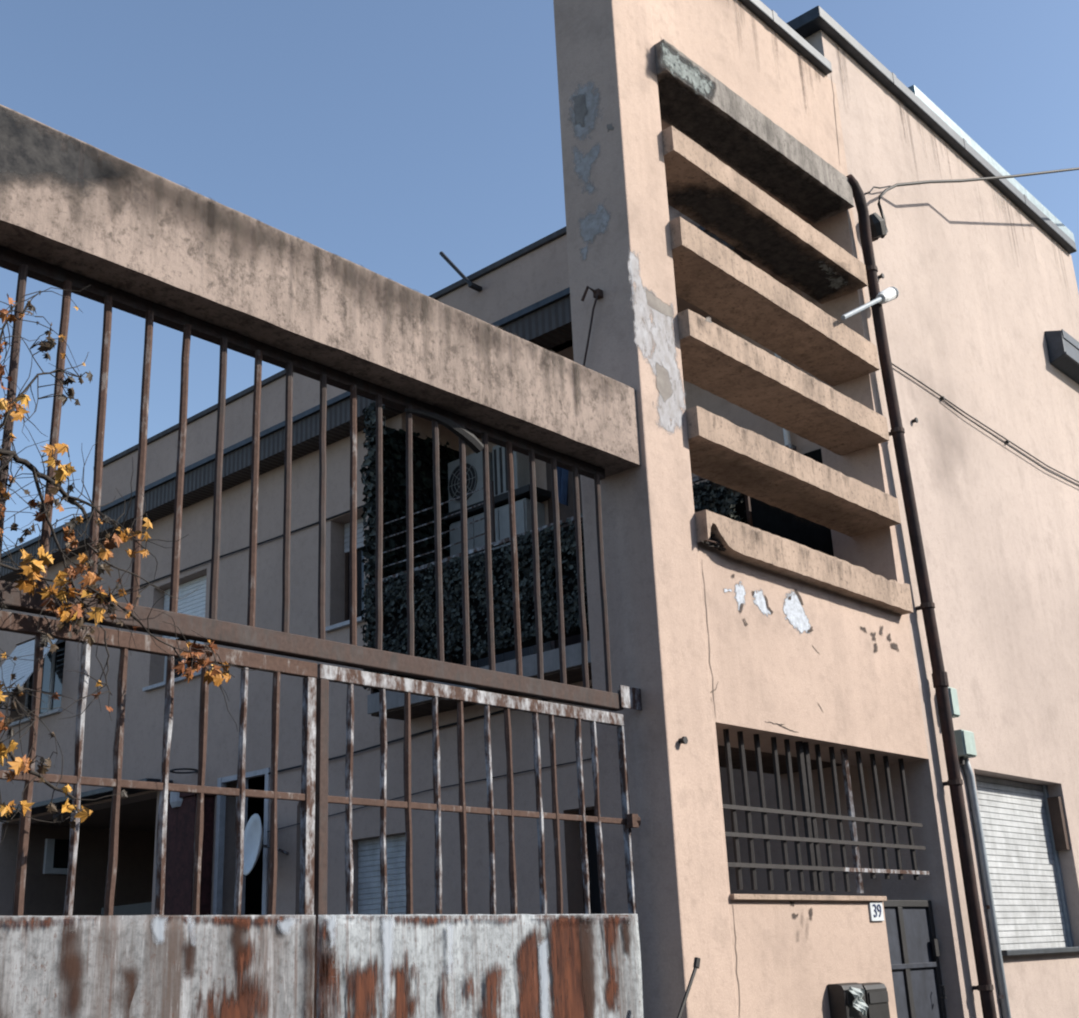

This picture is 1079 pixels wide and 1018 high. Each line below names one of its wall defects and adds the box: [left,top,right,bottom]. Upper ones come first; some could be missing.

peeling [570,84,599,140]
damp [0,105,135,191]
peeling [628,251,686,432]
peeling [724,574,813,633]
corrosion [352,915,520,926]
corrosion [0,917,97,1018]
corrosion [125,971,137,1010]
corrosion [161,916,419,1018]
corrosion [441,964,453,1018]
corrosion [462,965,504,1018]
corrosion [517,915,635,1018]